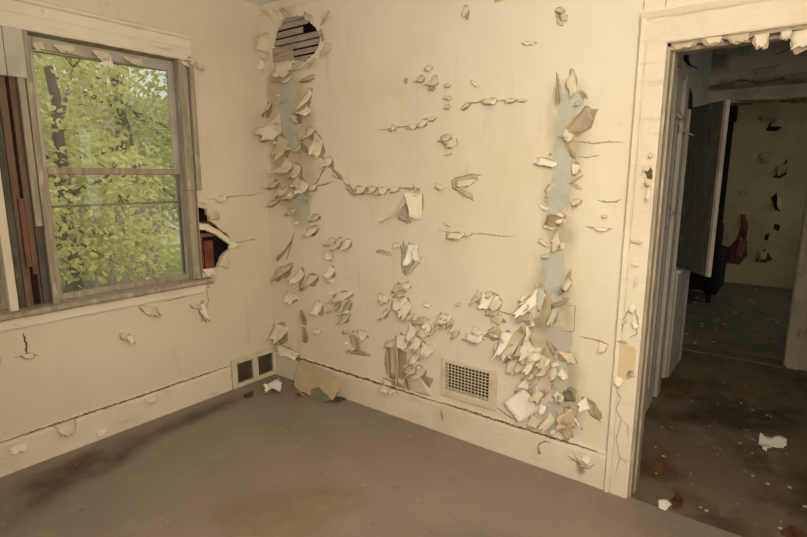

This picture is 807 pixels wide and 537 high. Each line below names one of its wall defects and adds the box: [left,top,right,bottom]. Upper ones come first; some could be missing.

peeling [669,25,807,69]
peeling [254,8,371,357]
spalling [138,202,243,323]
peeling [376,65,602,455]
peeling [726,214,780,265]
peeling [14,324,38,359]
crack [274,343,597,452]
peeling [568,451,595,473]
crack [615,391,628,475]